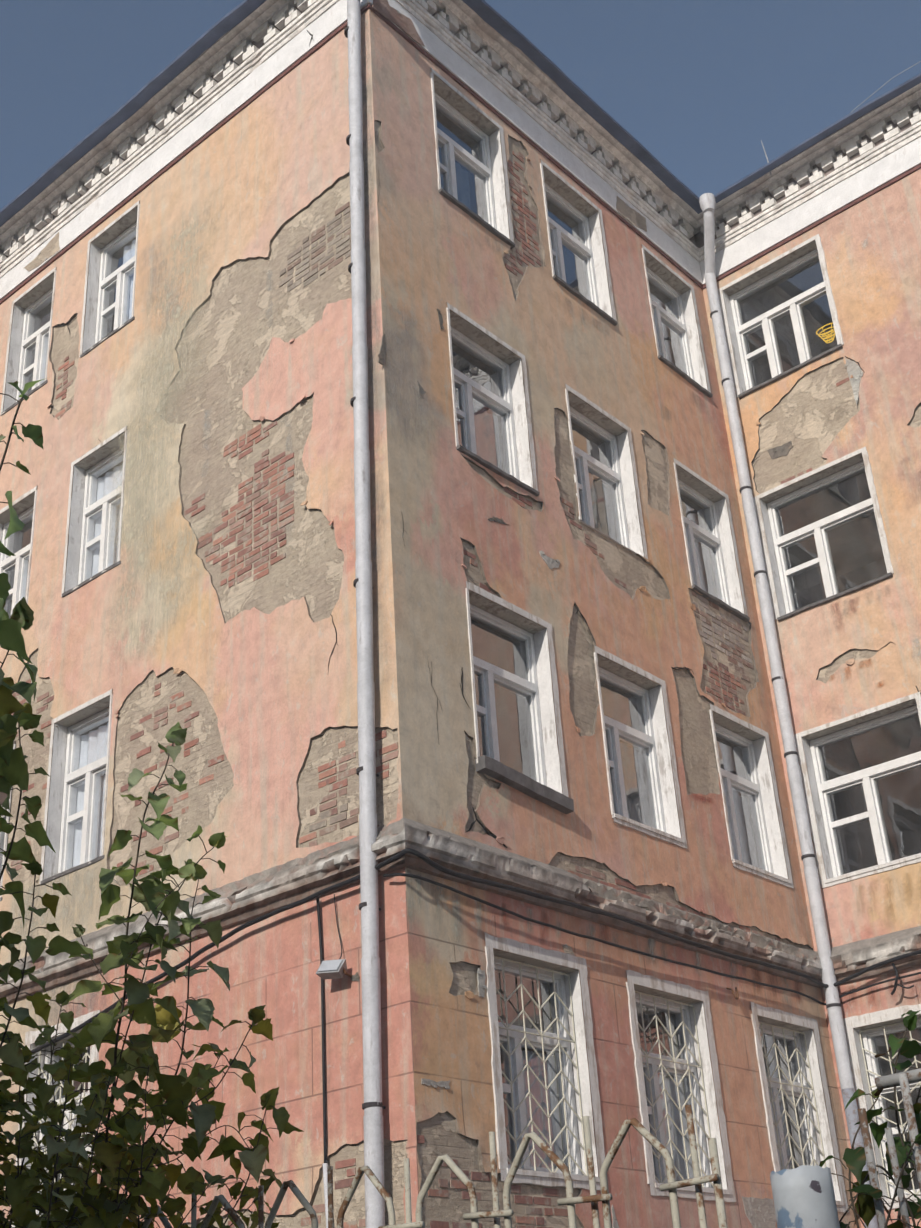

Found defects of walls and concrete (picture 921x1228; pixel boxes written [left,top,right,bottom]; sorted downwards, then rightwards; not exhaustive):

peeling [503,134,546,301]
peeling [47,313,80,420]
peeling [155,169,352,623]
peeling [554,408,670,600]
peeling [671,588,759,795]
peeling [107,667,234,886]
peeling [296,725,360,848]
peeling [375,726,399,828]
crack [466,807,507,848]
peeling [548,852,814,951]
peeling [171,1140,366,1228]
peeling [384,1111,584,1228]